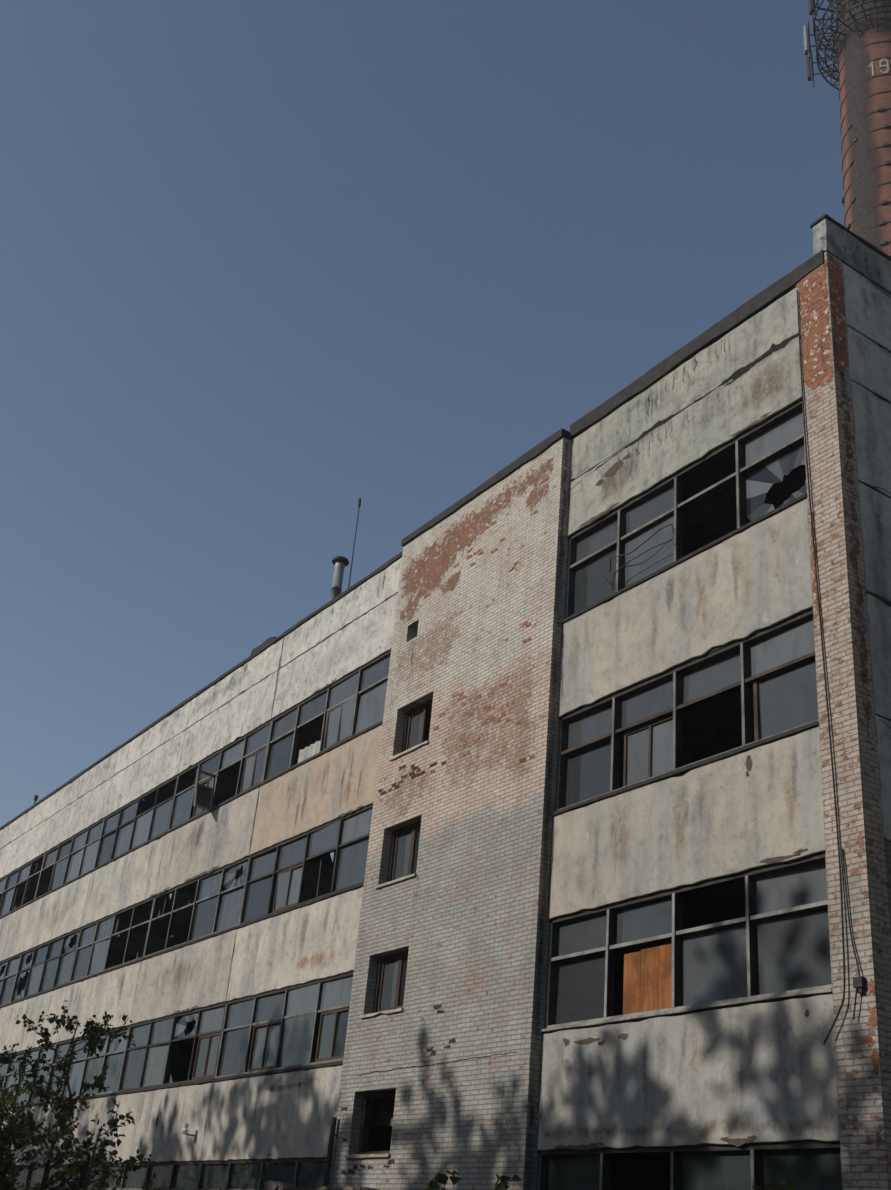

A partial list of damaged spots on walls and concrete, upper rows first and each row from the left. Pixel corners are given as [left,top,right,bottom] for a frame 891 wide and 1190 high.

crack [577,333,798,484]
peeling [400,442,569,620]
peeling [798,256,871,735]
crack [860,480,891,498]
peeling [378,672,535,815]